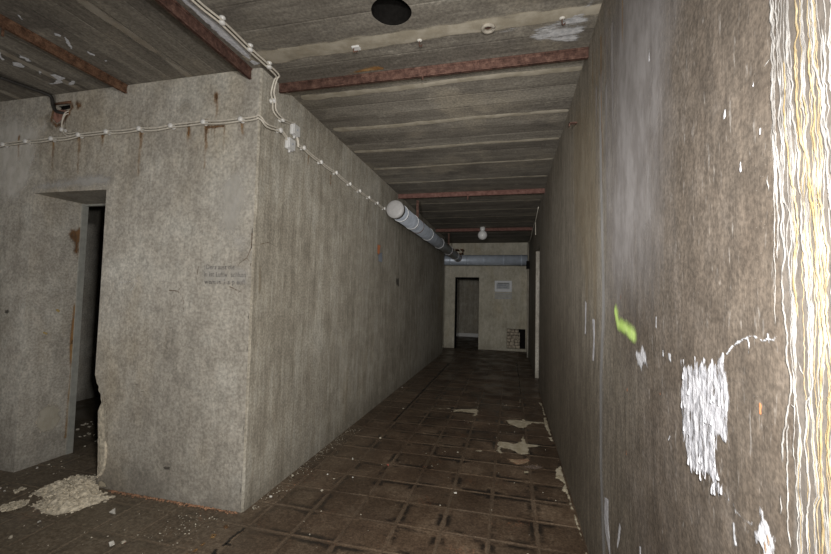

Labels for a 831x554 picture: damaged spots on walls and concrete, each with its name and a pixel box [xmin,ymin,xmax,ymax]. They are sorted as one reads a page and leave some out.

damp [531,14,587,41]
rust [69,228,80,253]
damp [765,0,831,554]
flaking render [95,376,107,487]